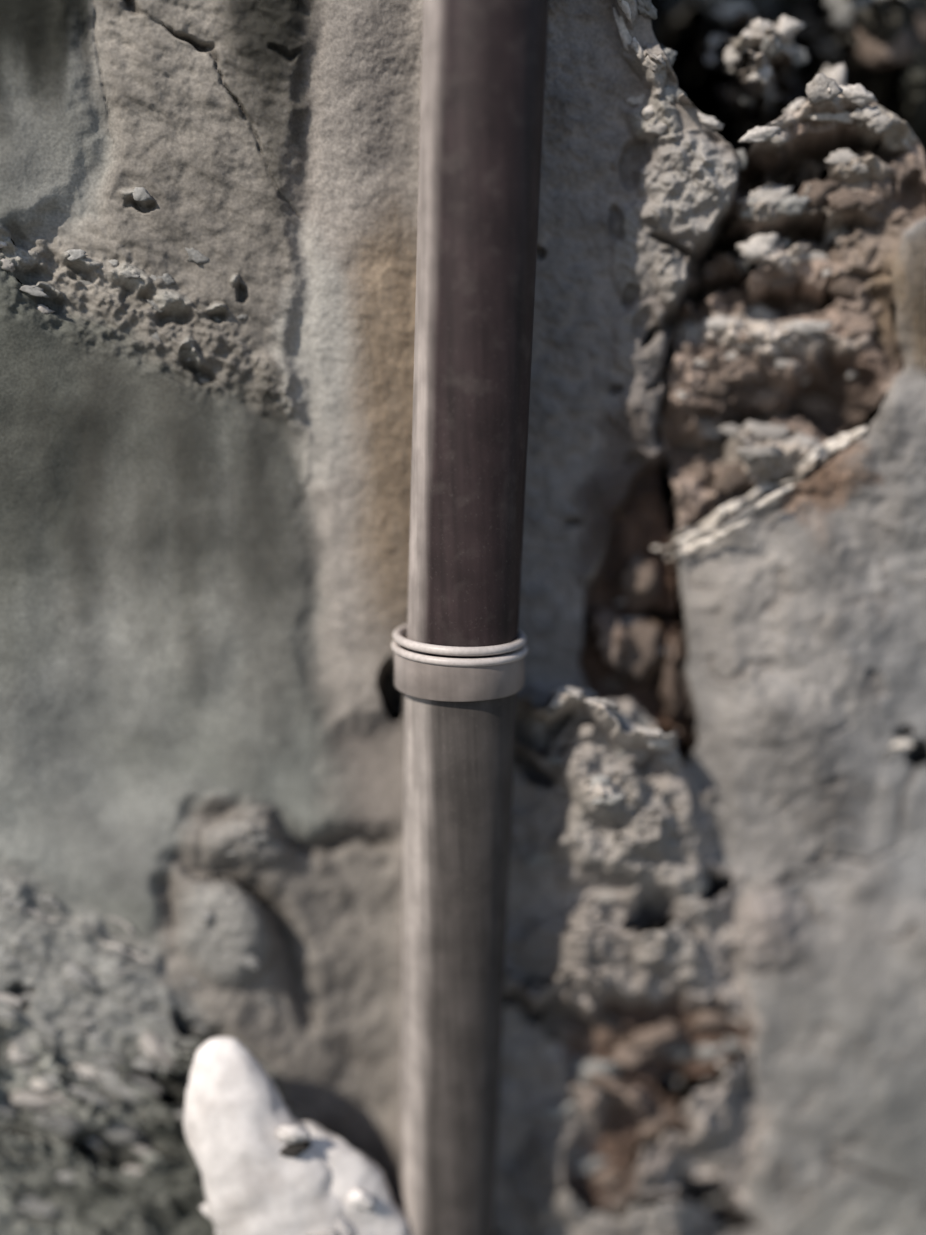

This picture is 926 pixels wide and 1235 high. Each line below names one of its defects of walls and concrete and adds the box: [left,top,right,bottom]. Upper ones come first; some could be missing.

damp [0,0,87,80]
spalling [131,187,152,201]
crack [93,0,303,220]
spalling [0,227,303,416]
spalling [522,0,926,807]
spalling [594,891,620,906]
spalling [560,994,755,1210]